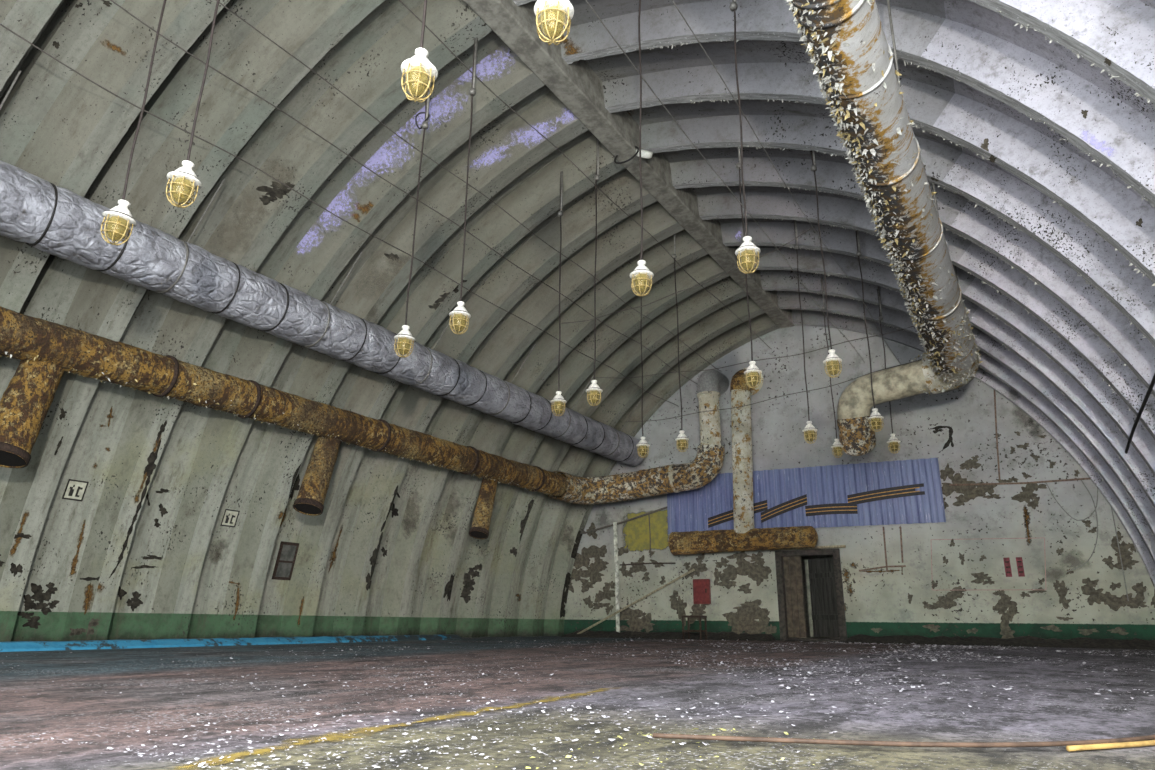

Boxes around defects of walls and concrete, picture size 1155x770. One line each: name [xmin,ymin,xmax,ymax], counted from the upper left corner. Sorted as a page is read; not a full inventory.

corrosion [134,421,167,503]
peeling [59,365,674,557]
peeling [994,431,1056,468]
peeling [0,554,23,577]
peeling [18,582,60,629]
peeling [560,522,710,633]
peeling [683,551,777,635]
peeling [908,531,1155,639]